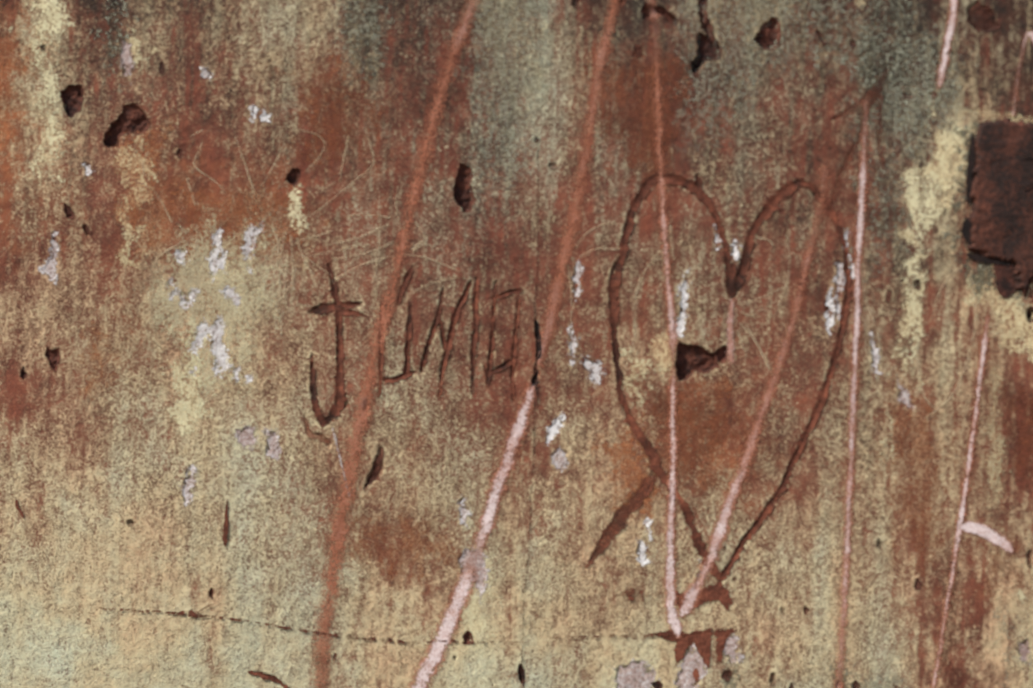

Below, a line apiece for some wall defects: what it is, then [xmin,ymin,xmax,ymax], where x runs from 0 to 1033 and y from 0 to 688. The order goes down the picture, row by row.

spalling [61,84,84,118]
spalling [103,103,150,148]
spalling [674,268,728,381]
peeling [675,559,736,612]
peeling [613,629,745,688]